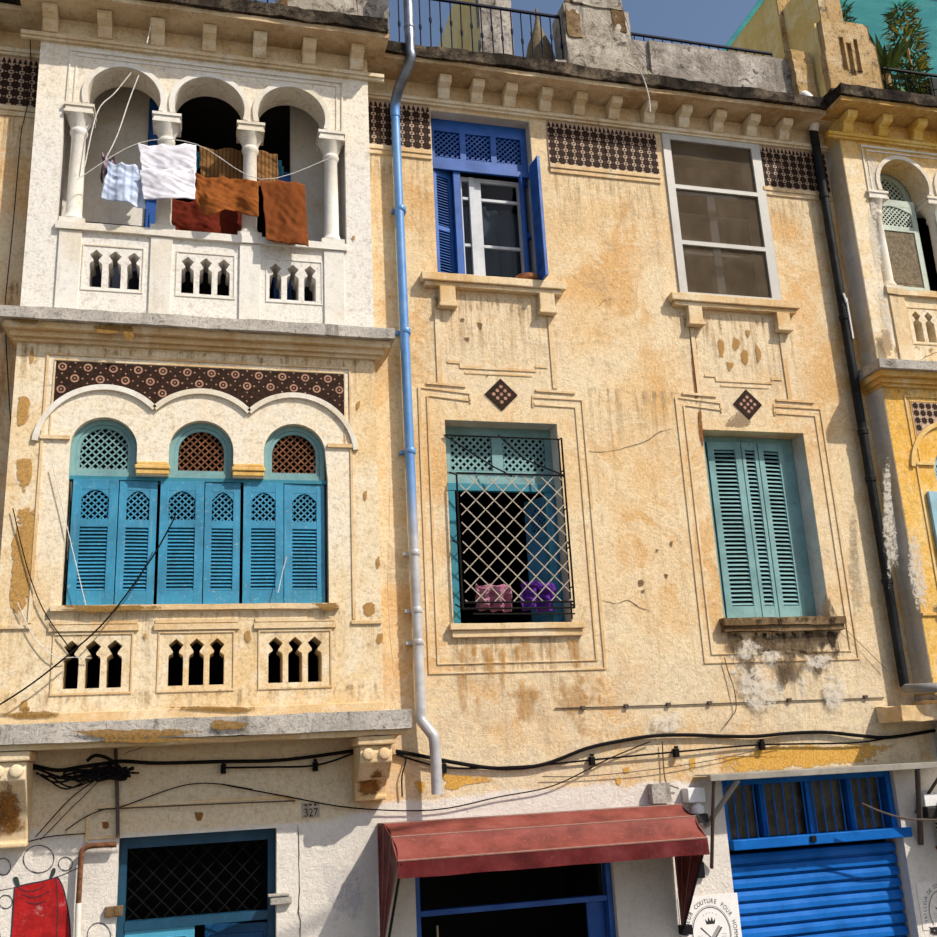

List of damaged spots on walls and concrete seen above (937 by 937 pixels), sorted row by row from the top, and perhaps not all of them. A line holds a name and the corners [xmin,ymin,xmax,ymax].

peeling [17,458,32,492]
peeling [10,507,39,614]
peeling [730,639,784,715]
peeling [793,649,848,716]
peeling [651,713,681,732]